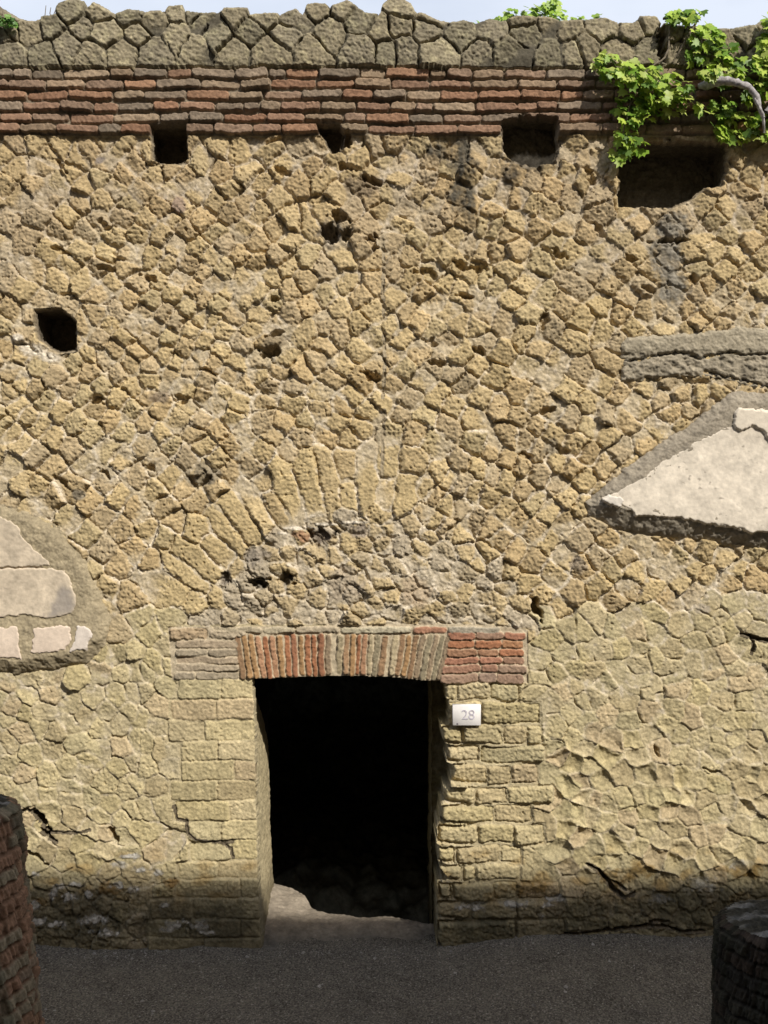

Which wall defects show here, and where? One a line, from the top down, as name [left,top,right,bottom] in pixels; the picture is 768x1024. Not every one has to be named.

crack [21,807,91,844]
crack [172,804,235,859]
crack [586,862,636,900]